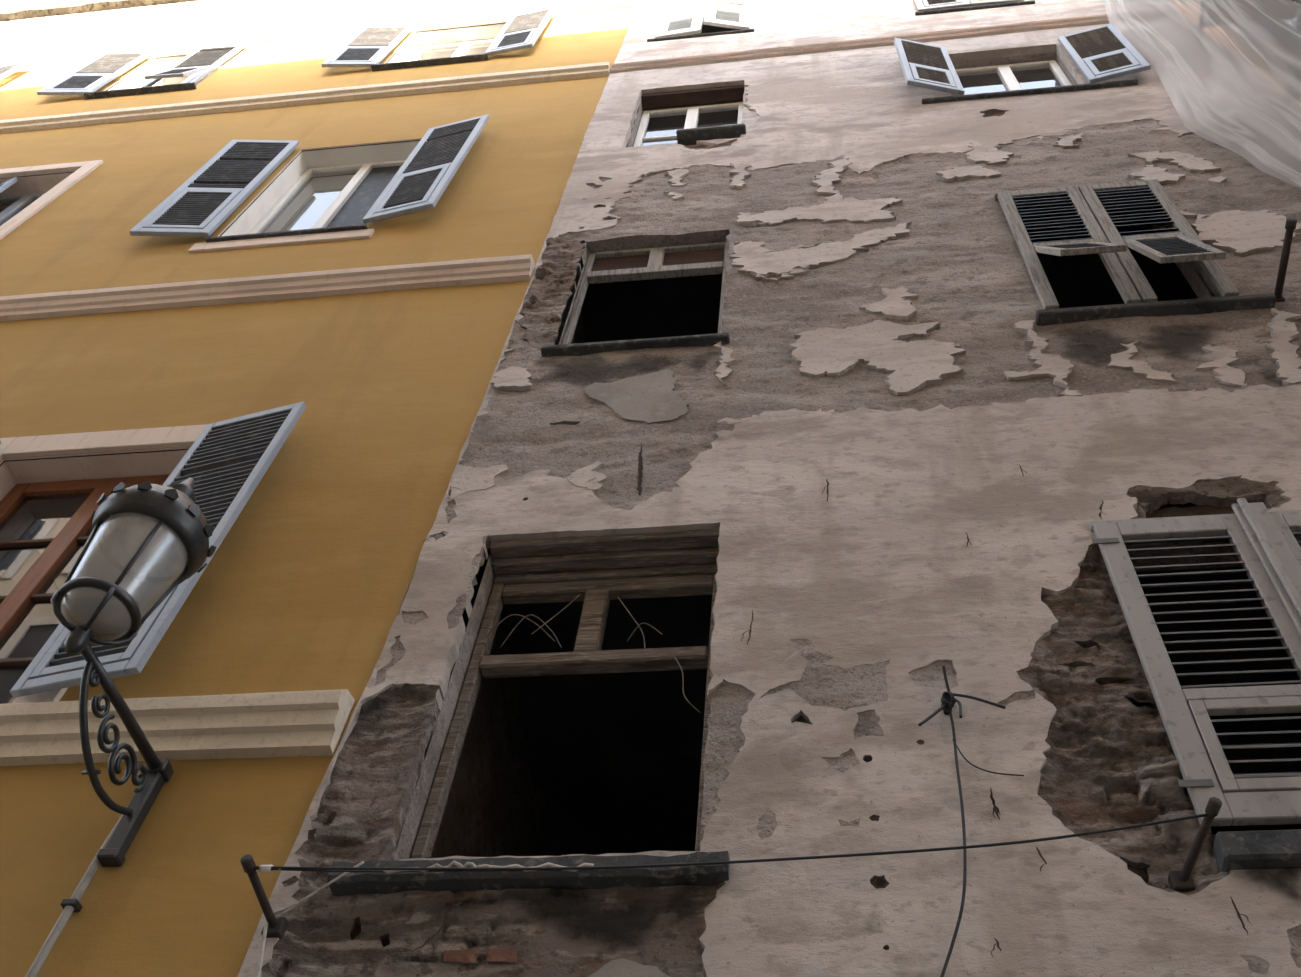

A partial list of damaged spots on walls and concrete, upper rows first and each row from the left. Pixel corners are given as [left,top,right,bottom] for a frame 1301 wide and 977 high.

peeling [430,87,1301,540]
leakage [1069,331,1125,362]
spalling [997,544,1230,896]
spalling [261,611,725,977]
spalling [870,876,889,889]
leakage [514,885,693,945]
peeling [1240,955,1270,975]
peeling [1287,925,1301,968]